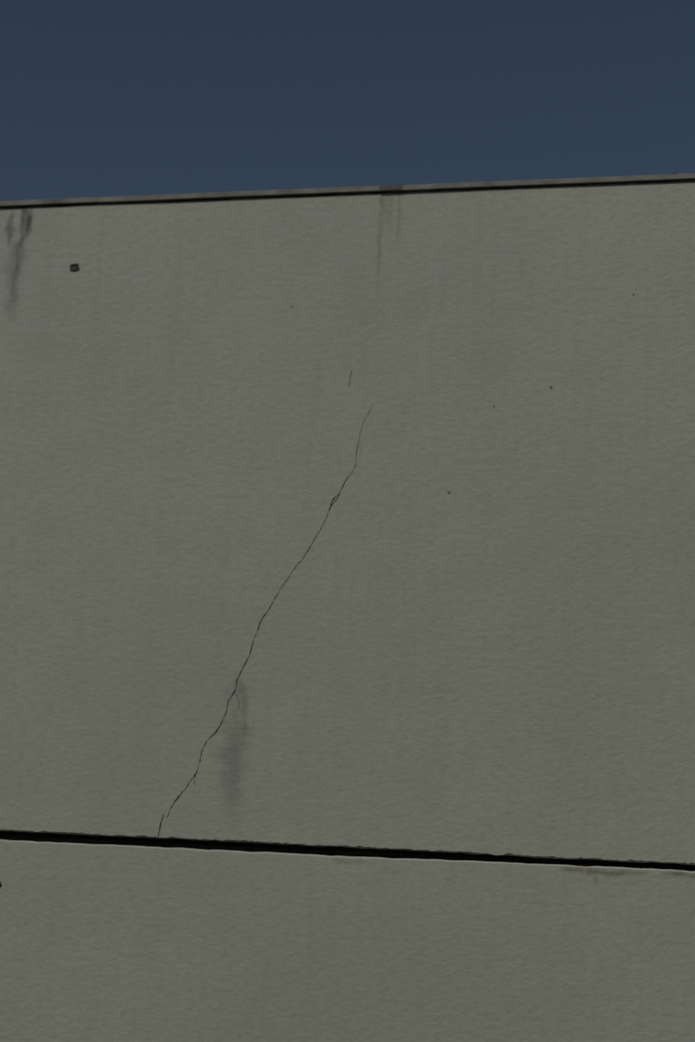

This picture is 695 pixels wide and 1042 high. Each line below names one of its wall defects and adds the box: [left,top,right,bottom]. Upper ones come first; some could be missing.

crack [158,411,370,836]